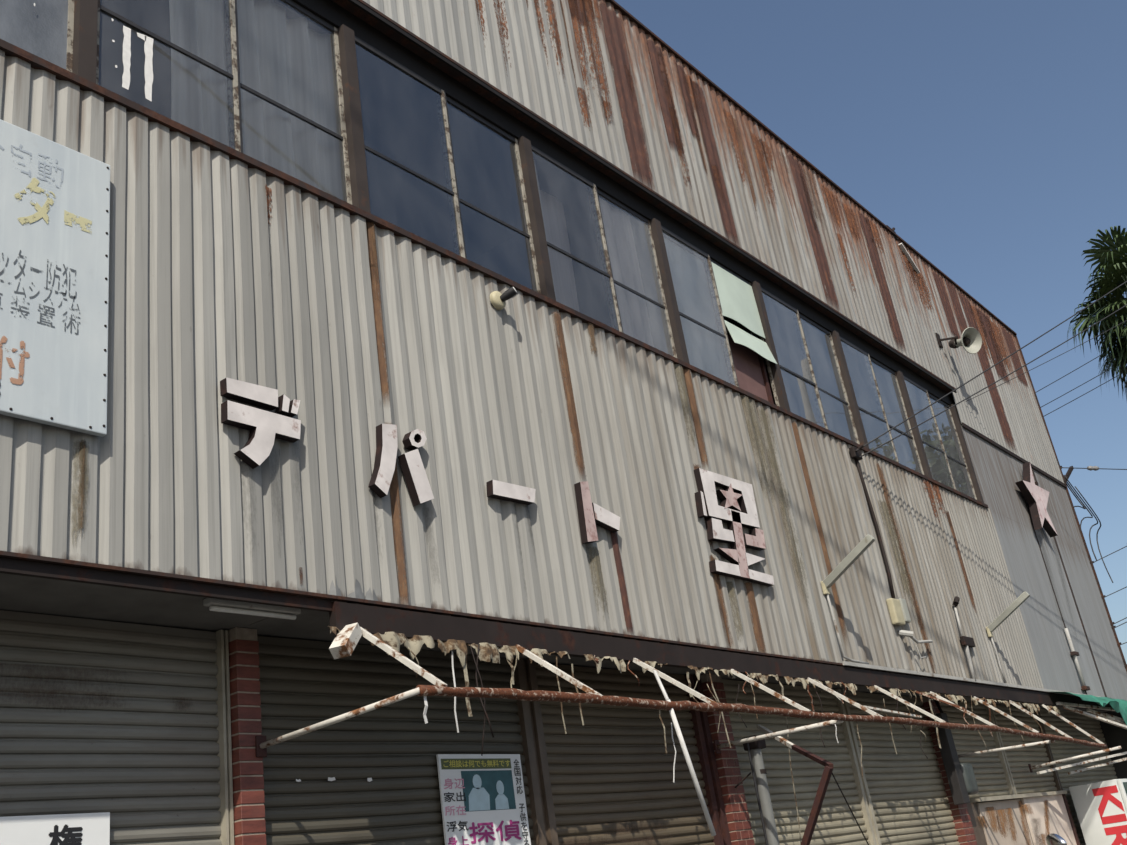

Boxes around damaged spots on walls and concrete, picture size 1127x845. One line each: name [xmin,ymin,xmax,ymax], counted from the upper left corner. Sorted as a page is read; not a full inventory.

rust [366,222,389,398]
rust [475,0,511,73]
rust [554,312,585,473]
rust [526,0,654,186]
rust [588,323,598,356]
rust [646,40,739,242]
rust [723,108,905,347]
rust [899,246,1028,445]
rust [389,461,409,603]
rust [791,422,846,634]